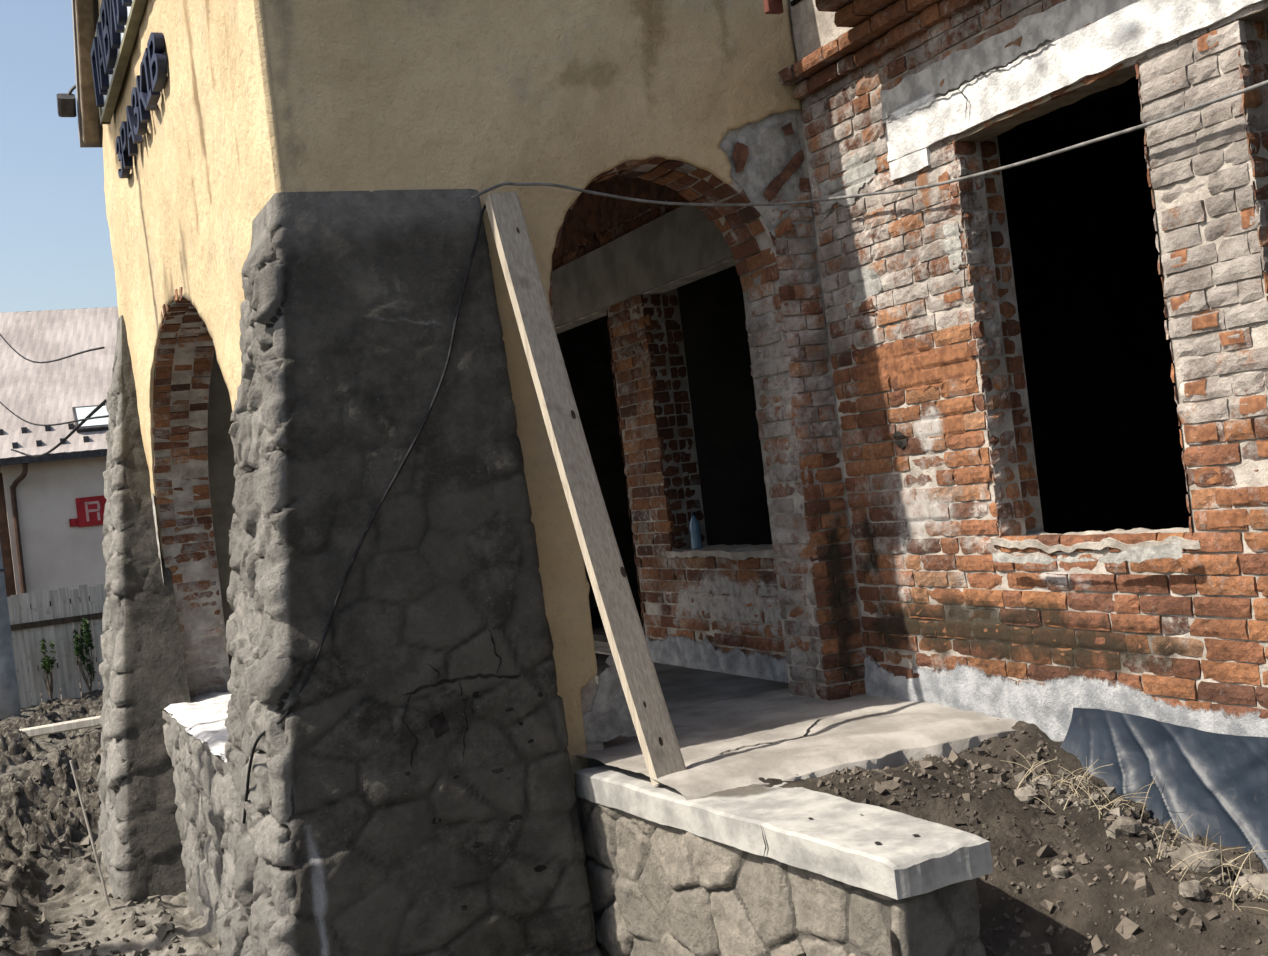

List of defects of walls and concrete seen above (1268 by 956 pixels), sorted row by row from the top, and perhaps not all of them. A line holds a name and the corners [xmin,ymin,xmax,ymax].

crack [882,39,1054,121]
peeling [720,110,884,242]
peeling [848,268,881,317]
peeling [942,223,966,303]
leakage [915,408,940,449]
leakage [898,489,948,551]
leakage [823,518,856,676]
leakage [875,599,1181,671]
leakage [1041,571,1070,586]
crack [402,629,520,767]